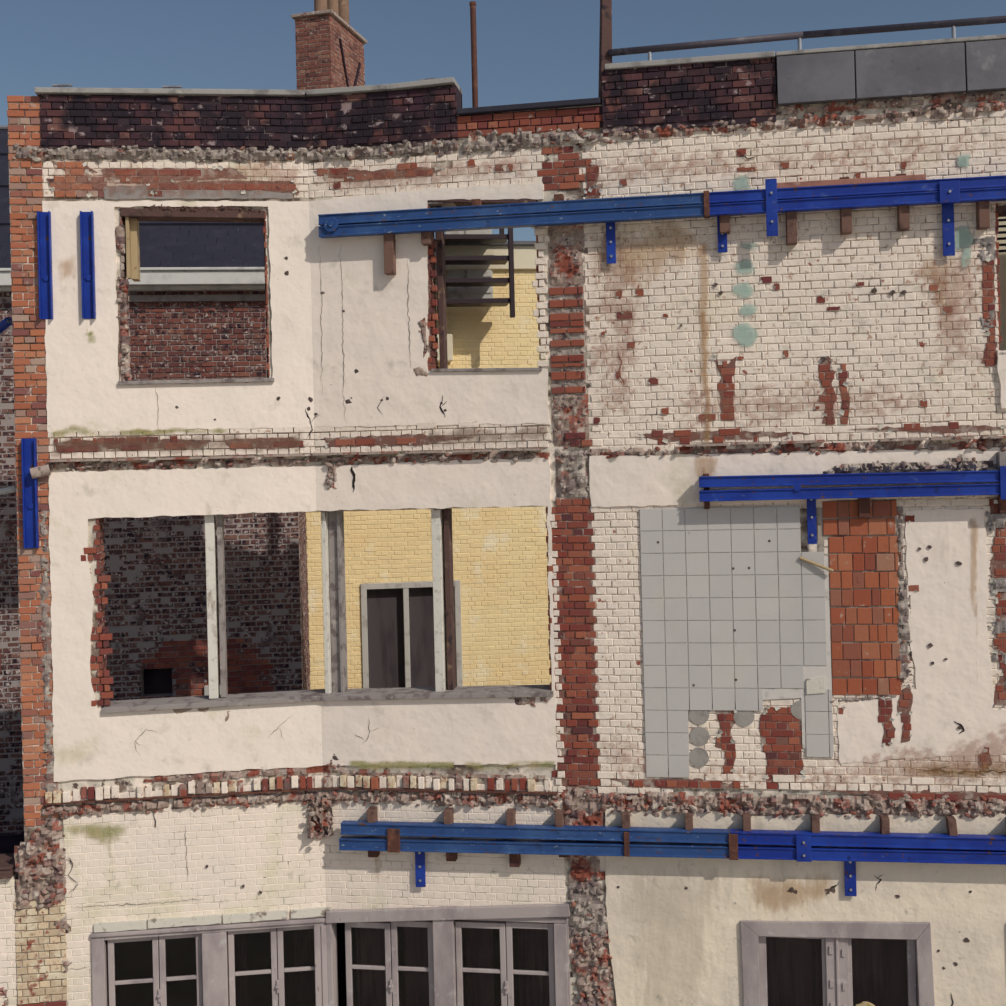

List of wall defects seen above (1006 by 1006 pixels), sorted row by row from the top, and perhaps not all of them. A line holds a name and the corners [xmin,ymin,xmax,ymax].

flaking render [315,163,445,189]
flaking render [583,159,604,199]
crack [318,243,346,415]
flaking render [638,354,811,444]
flaking render [814,356,1006,434]
spalling [14,508,67,910]
flaking render [759,705,807,790]
flaking render [878,684,913,747]
spalling [54,916,71,937]